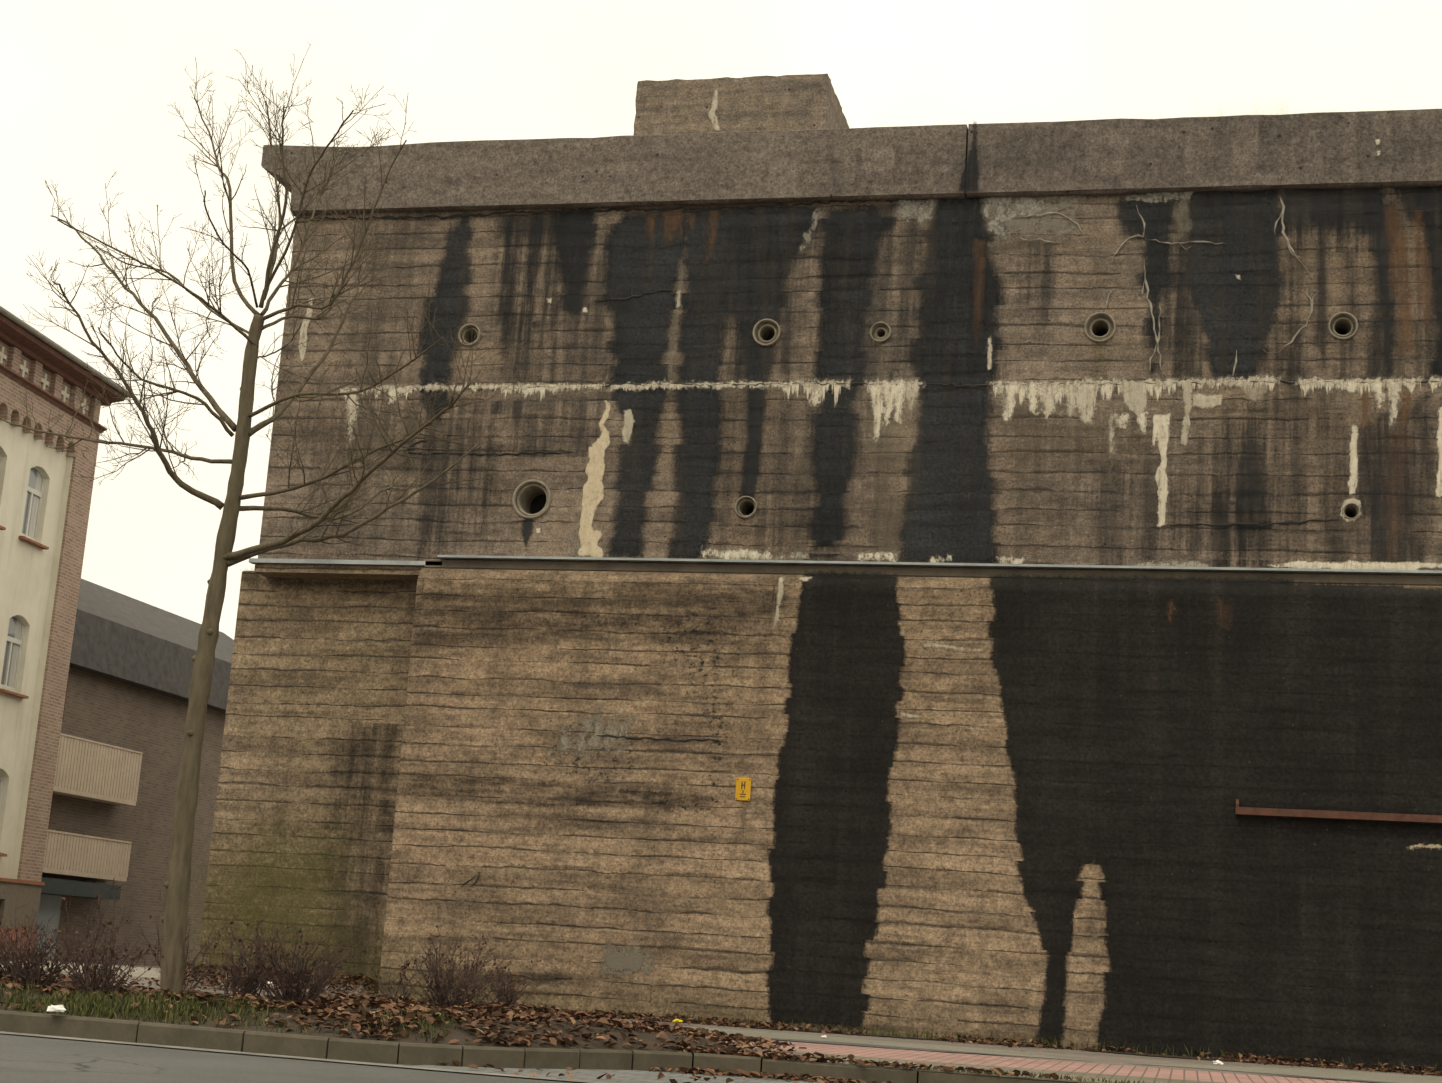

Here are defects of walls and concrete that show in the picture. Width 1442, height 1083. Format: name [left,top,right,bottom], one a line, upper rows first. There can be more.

crack [306,197,1442,392]
water stain [339,122,1442,1073]